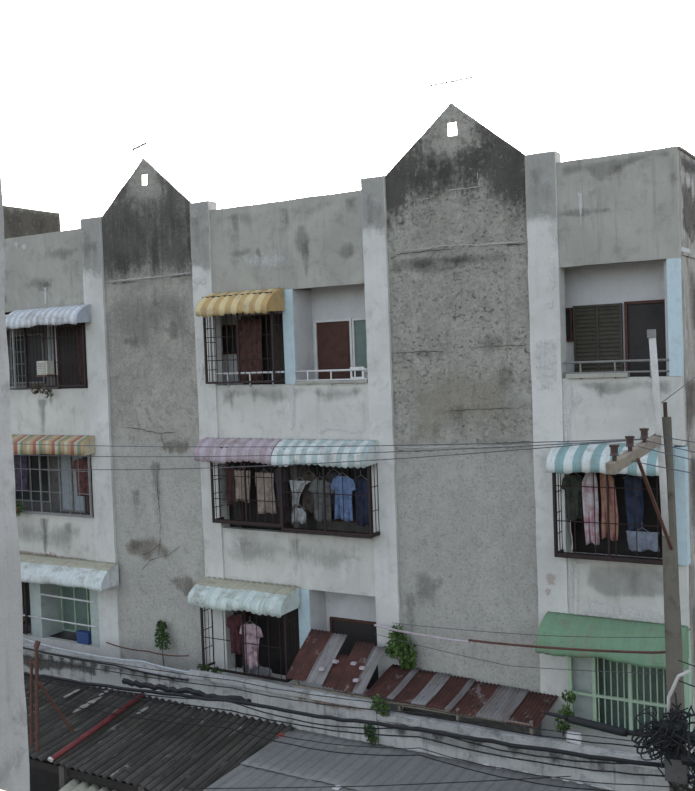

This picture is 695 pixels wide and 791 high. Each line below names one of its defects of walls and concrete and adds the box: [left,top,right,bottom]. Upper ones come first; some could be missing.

leakage [80,177,210,277]
leakage [360,123,556,227]
leakage [682,158,695,186]
crack [141,464,178,571]